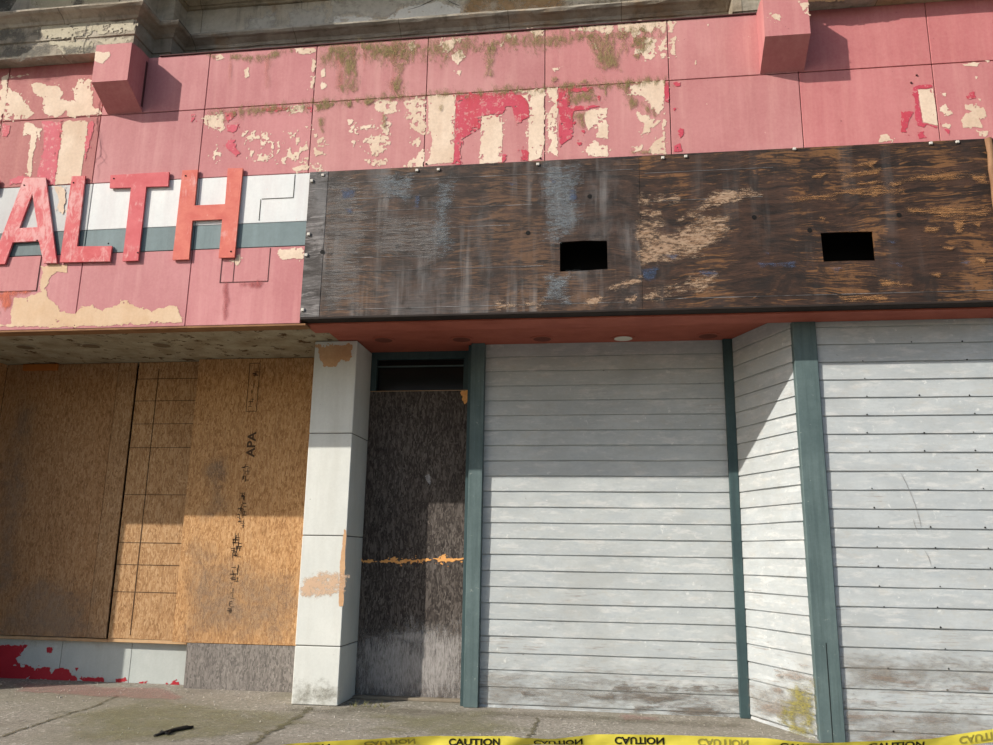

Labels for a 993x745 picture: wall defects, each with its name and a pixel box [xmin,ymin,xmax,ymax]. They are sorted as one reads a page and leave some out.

peeling [0,73,102,217]
leakage [215,26,665,131]
peeling [347,86,611,168]
peeling [627,80,685,155]
peeling [879,60,989,143]
peeling [637,190,761,263]
peeling [0,263,182,328]
peeling [669,271,715,292]
peeling [315,343,353,367]
peeling [300,529,346,606]
peeling [0,644,104,682]